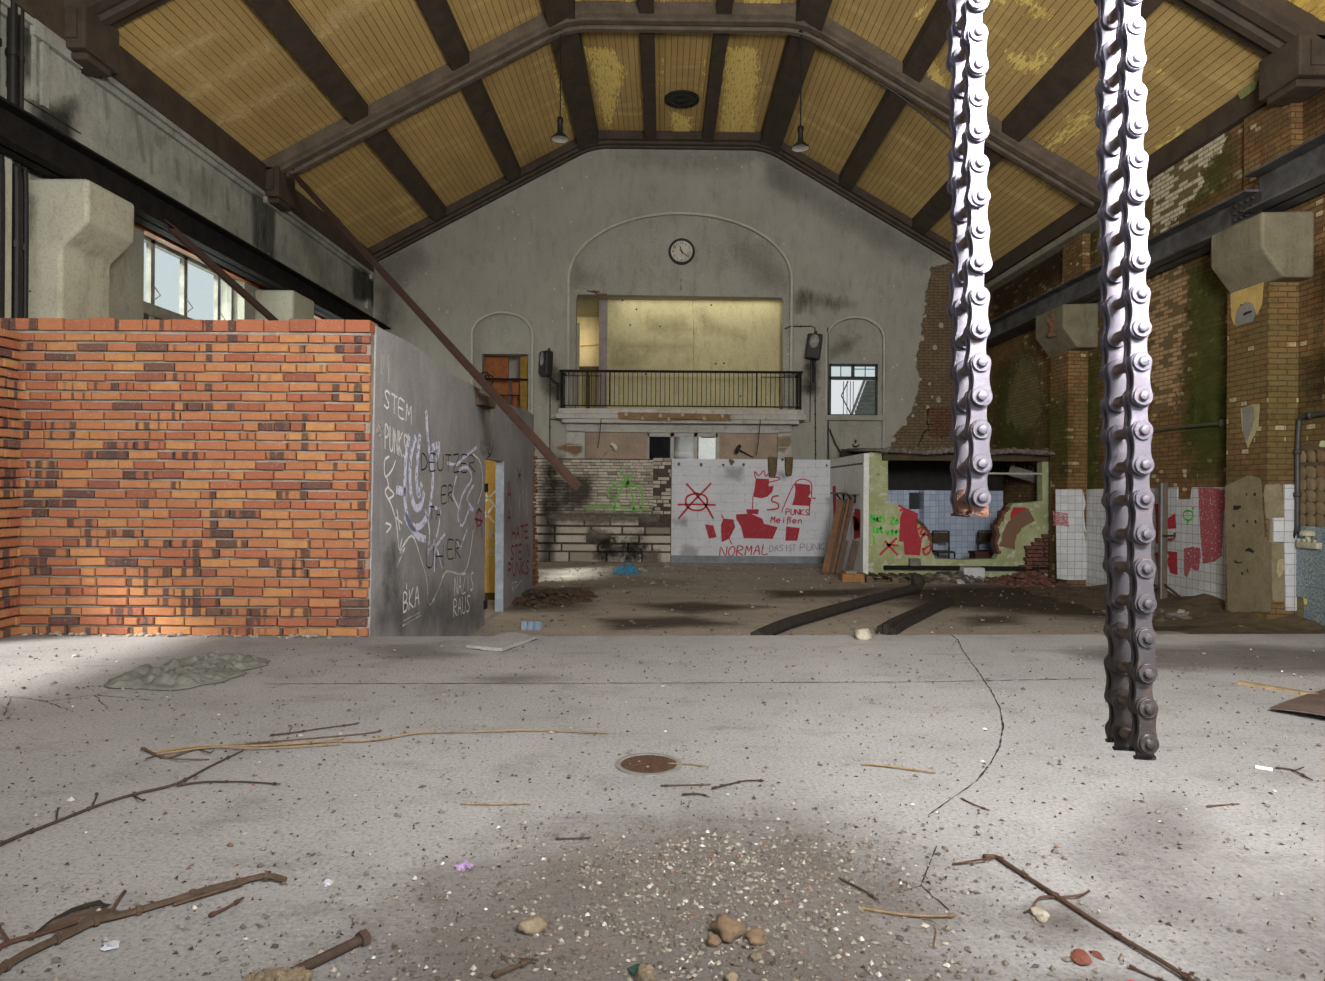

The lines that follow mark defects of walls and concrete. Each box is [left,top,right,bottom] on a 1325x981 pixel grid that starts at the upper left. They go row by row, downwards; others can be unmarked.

flaking render [891,262,954,449]
spalling [990,506,1010,554]
spalling [1019,530,1050,573]
crack [930,635,1004,814]
crack [897,846,950,910]